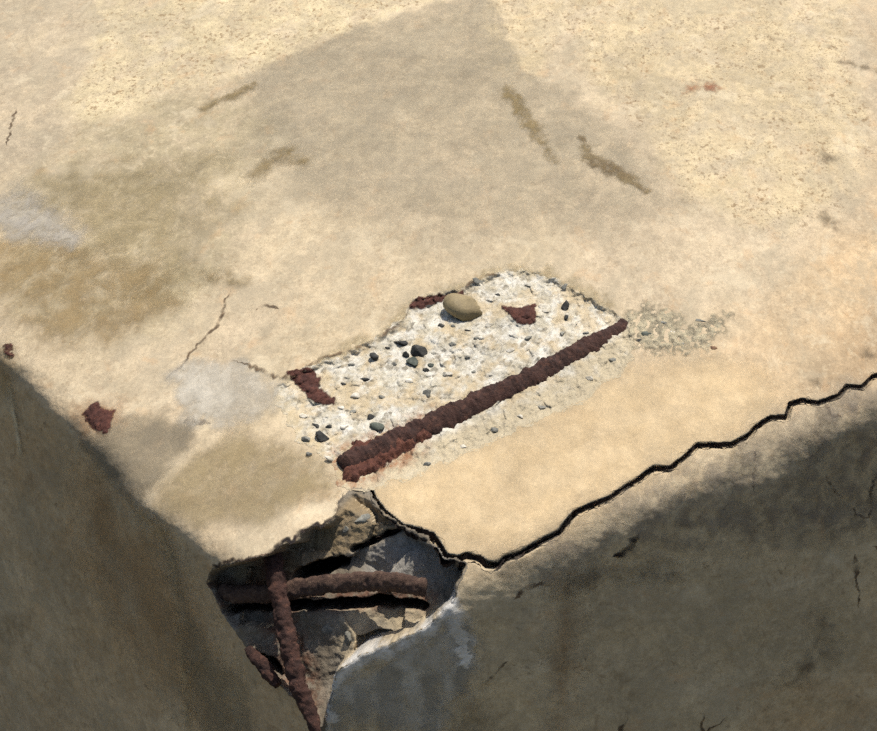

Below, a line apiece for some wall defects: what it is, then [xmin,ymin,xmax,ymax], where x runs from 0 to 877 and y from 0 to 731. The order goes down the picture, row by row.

water stain [494,70,650,193]
water stain [0,171,182,335]
corrosion [3,343,14,359]
corrosion [82,401,116,436]
crack [167,295,229,378]
crack [233,345,361,378]
corrosion [287,367,335,404]
water stain [166,437,329,524]
spalling [167,267,731,731]
crack [359,372,877,571]
corrosion [244,646,282,689]
water stain [325,592,475,731]